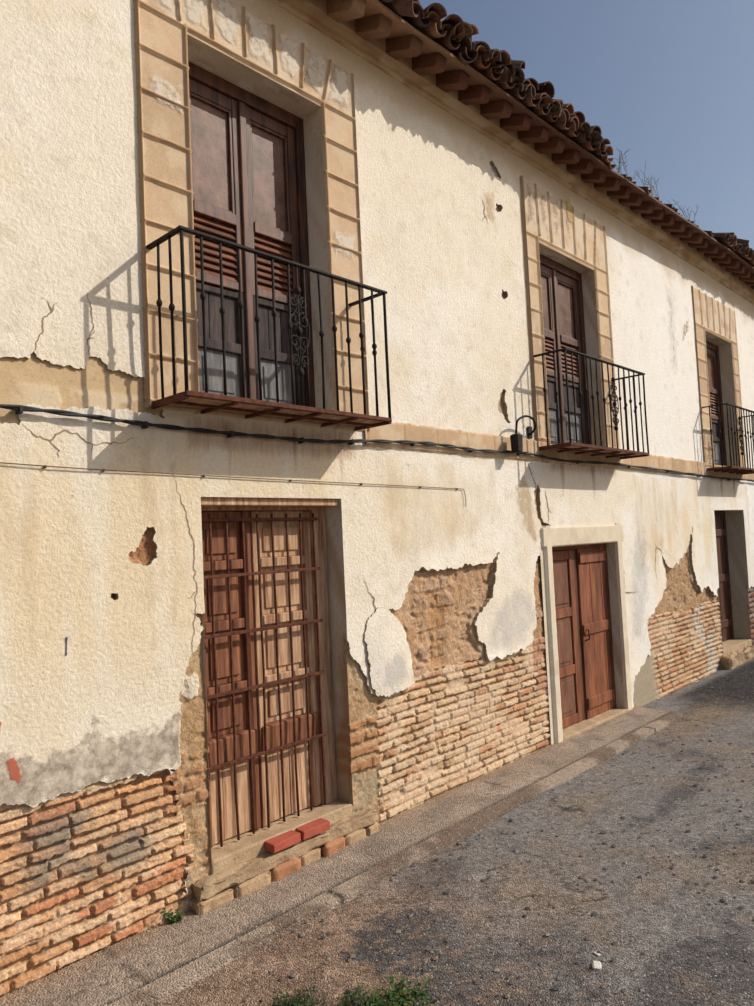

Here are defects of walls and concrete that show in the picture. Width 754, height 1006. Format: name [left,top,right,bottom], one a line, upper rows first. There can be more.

crack [35,300,57,350]
crack [87,294,95,354]
peeling [0,353,162,425]
crack [22,424,138,457]
peeling [519,482,548,540]
spalling [129,527,155,566]
spalling [633,541,723,707]
spalling [738,587,754,647]
spalling [343,556,553,824]
spalling [0,614,211,996]